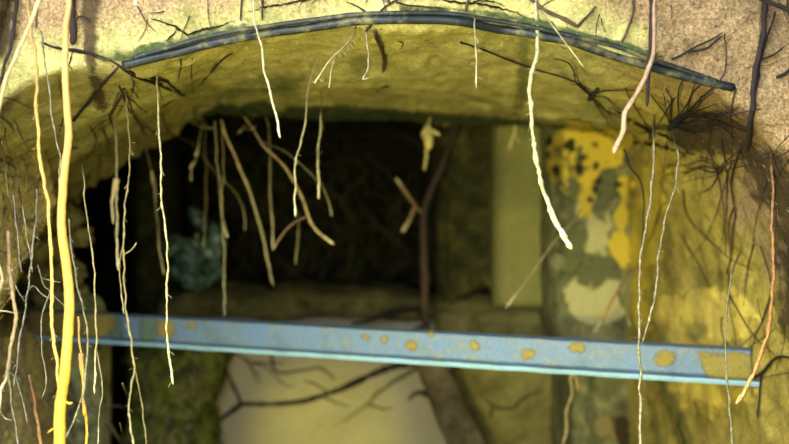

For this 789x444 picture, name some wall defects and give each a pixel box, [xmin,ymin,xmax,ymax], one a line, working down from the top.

peeling [547,120,762,348]
corrosion [522,349,535,361]
corrosion [568,342,585,353]
corrosion [653,349,676,366]
corrosion [698,351,757,381]
peeling [666,379,757,420]